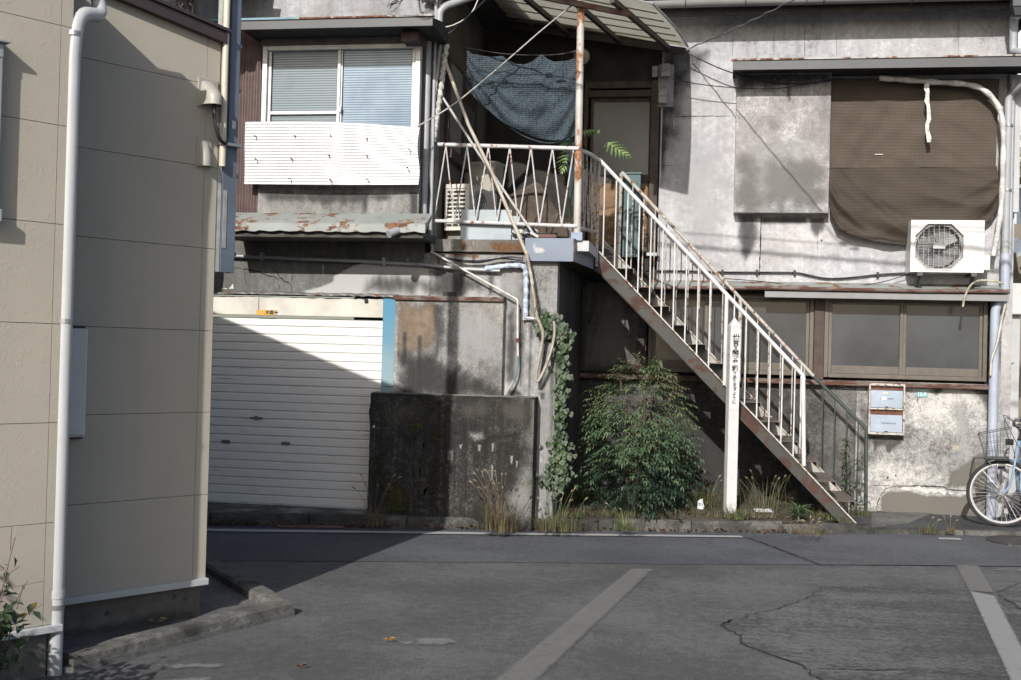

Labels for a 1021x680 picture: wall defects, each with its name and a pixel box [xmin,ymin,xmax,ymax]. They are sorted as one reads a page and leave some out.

water stain [739,143,824,257]
water stain [372,271,493,294]
water stain [385,303,553,447]
water stain [507,468,545,518]
crack [720,536,1020,679]